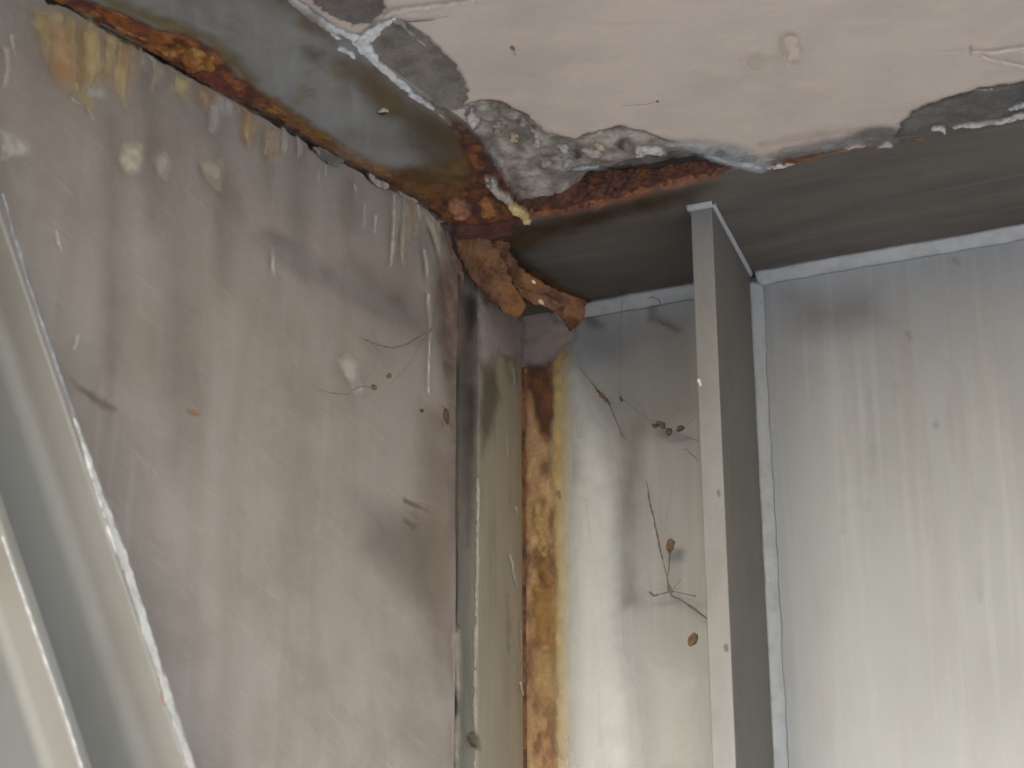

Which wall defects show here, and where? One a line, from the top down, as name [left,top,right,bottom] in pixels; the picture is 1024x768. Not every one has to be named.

damp [36,12,156,120]
spalling [313,0,758,205]
spalling [893,82,1024,139]
rust [54,0,688,768]